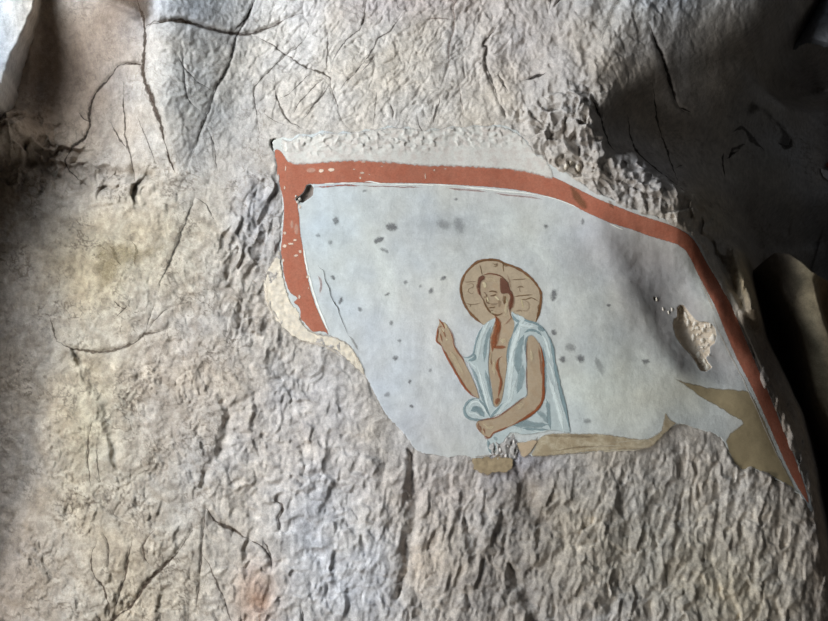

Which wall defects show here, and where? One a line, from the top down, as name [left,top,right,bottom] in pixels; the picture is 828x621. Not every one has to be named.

spalling [295,185,314,209]
flaking render [263,232,364,374]
spalling [653,297,716,372]
flaking render [472,434,537,475]